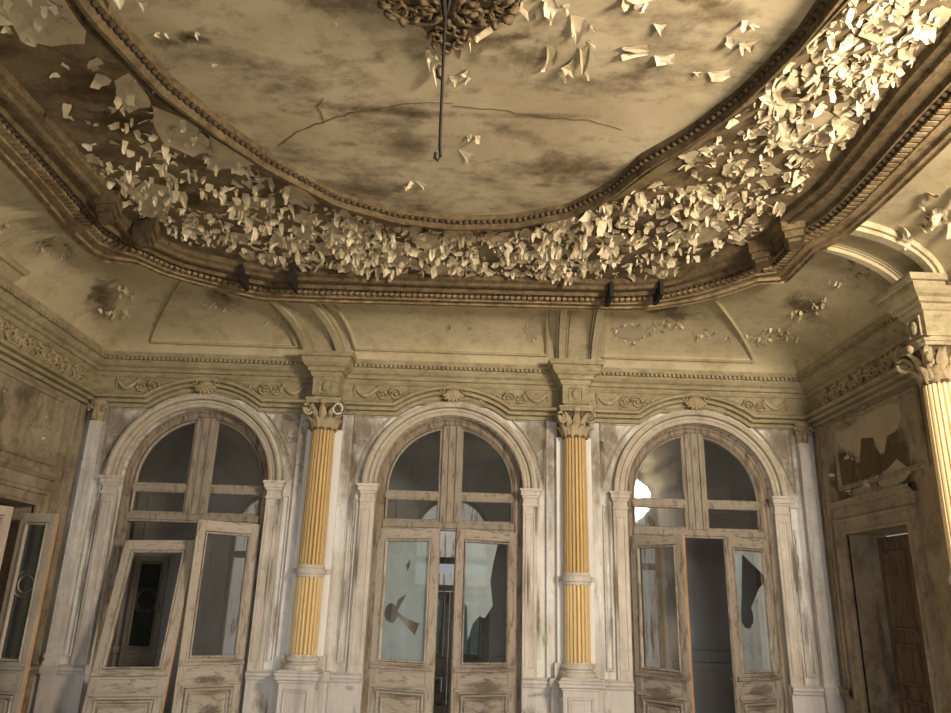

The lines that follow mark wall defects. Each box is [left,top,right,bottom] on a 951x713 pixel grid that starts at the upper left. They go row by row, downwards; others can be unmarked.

peeling [0,0,86,47]
peeling [62,103,73,121]
leakage [66,84,111,103]
leakage [101,117,141,132]
leakage [372,107,424,115]
crack [278,97,622,147]
peeling [82,0,951,290]
peeling [98,285,135,321]
spalling [836,403,902,463]
spalling [875,459,911,491]